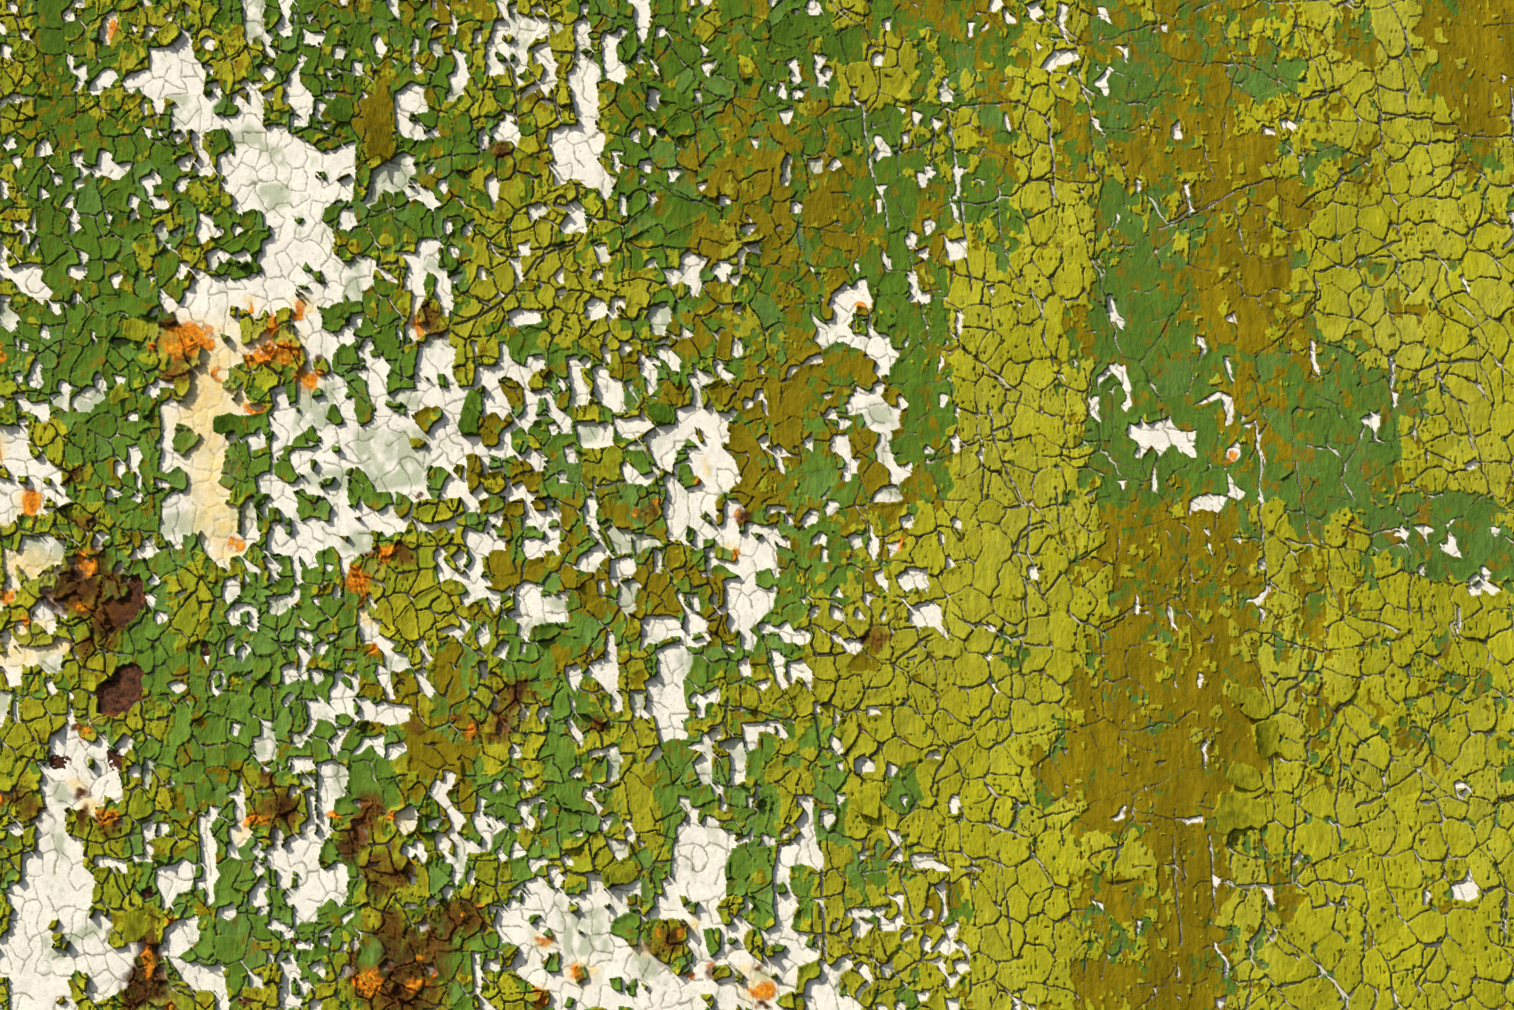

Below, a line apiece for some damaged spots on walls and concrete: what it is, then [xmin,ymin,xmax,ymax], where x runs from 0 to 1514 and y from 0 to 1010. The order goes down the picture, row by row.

peeling [1097,7,1112,24]
crack [862,103,889,228]
corrosion [8,548,129,658]
corrosion [148,299,323,559]
peeling [0,0,985,1010]
crack [976,406,1061,593]
peeling [1027,563,1039,582]
peeling [1082,45,1514,1010]
crack [1251,395,1365,579]
crack [1173,835,1230,949]
corrosion [122,908,175,1010]
corrosion [348,902,485,1010]